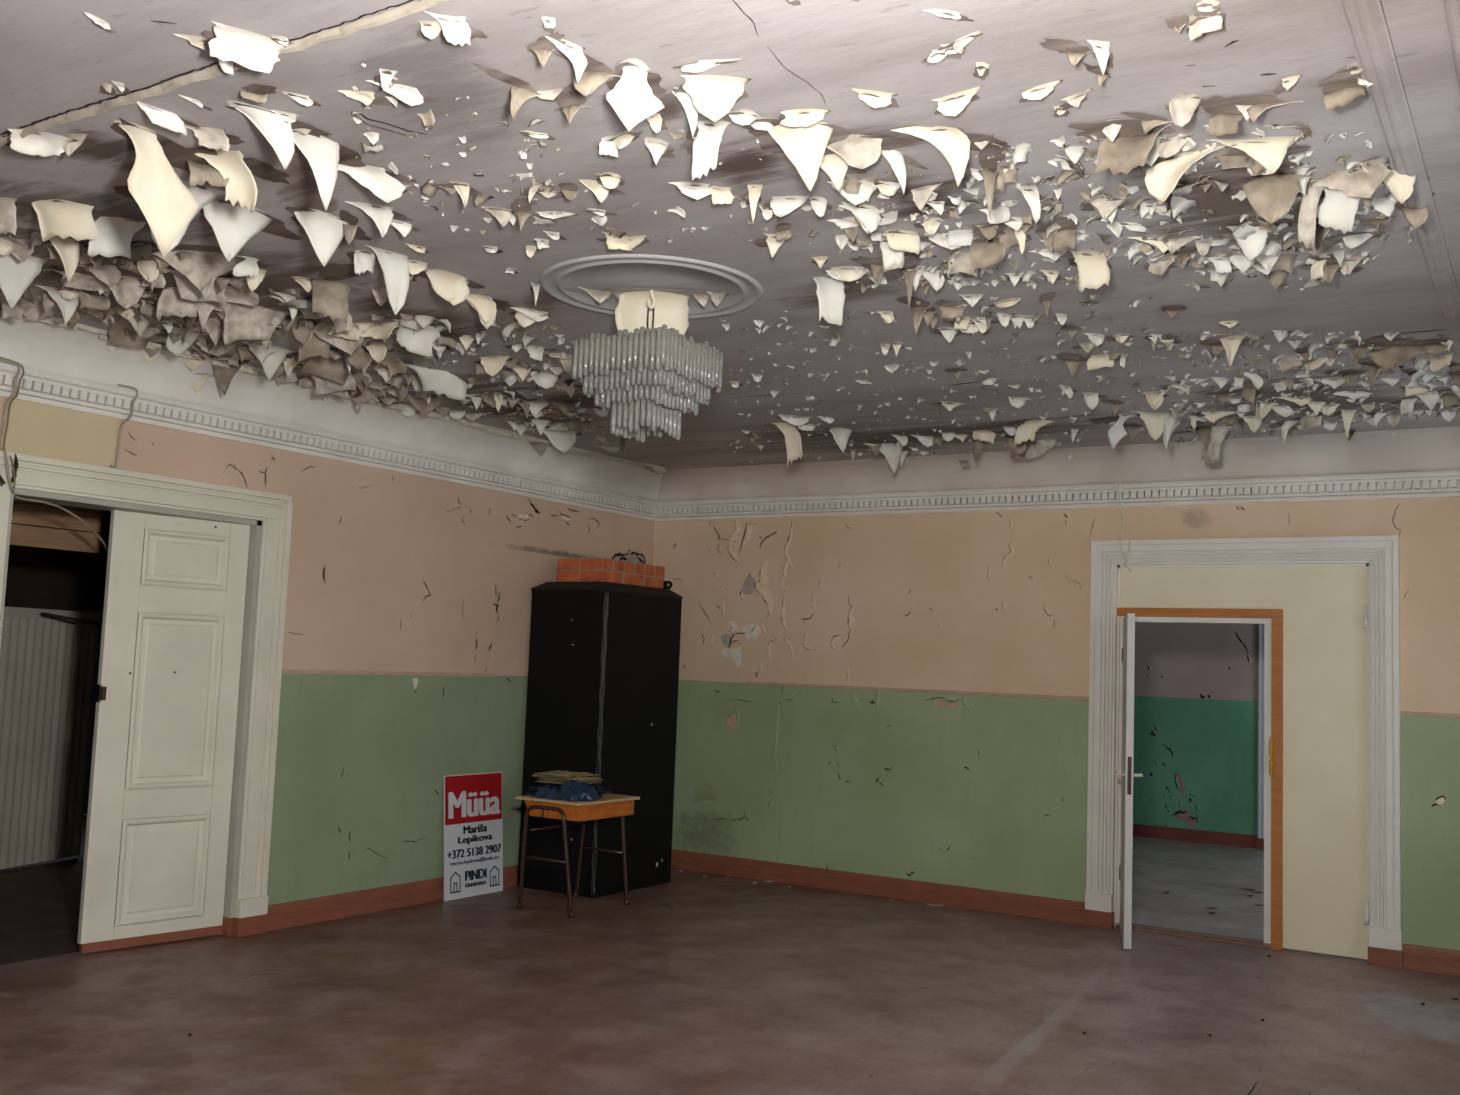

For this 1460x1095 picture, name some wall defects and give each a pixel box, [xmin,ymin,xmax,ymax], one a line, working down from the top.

crack [733,0,826,104]
peeling [1165,0,1225,41]
peeling [0,9,1460,474]
spalling [710,520,783,667]
spalling [1150,725,1200,828]